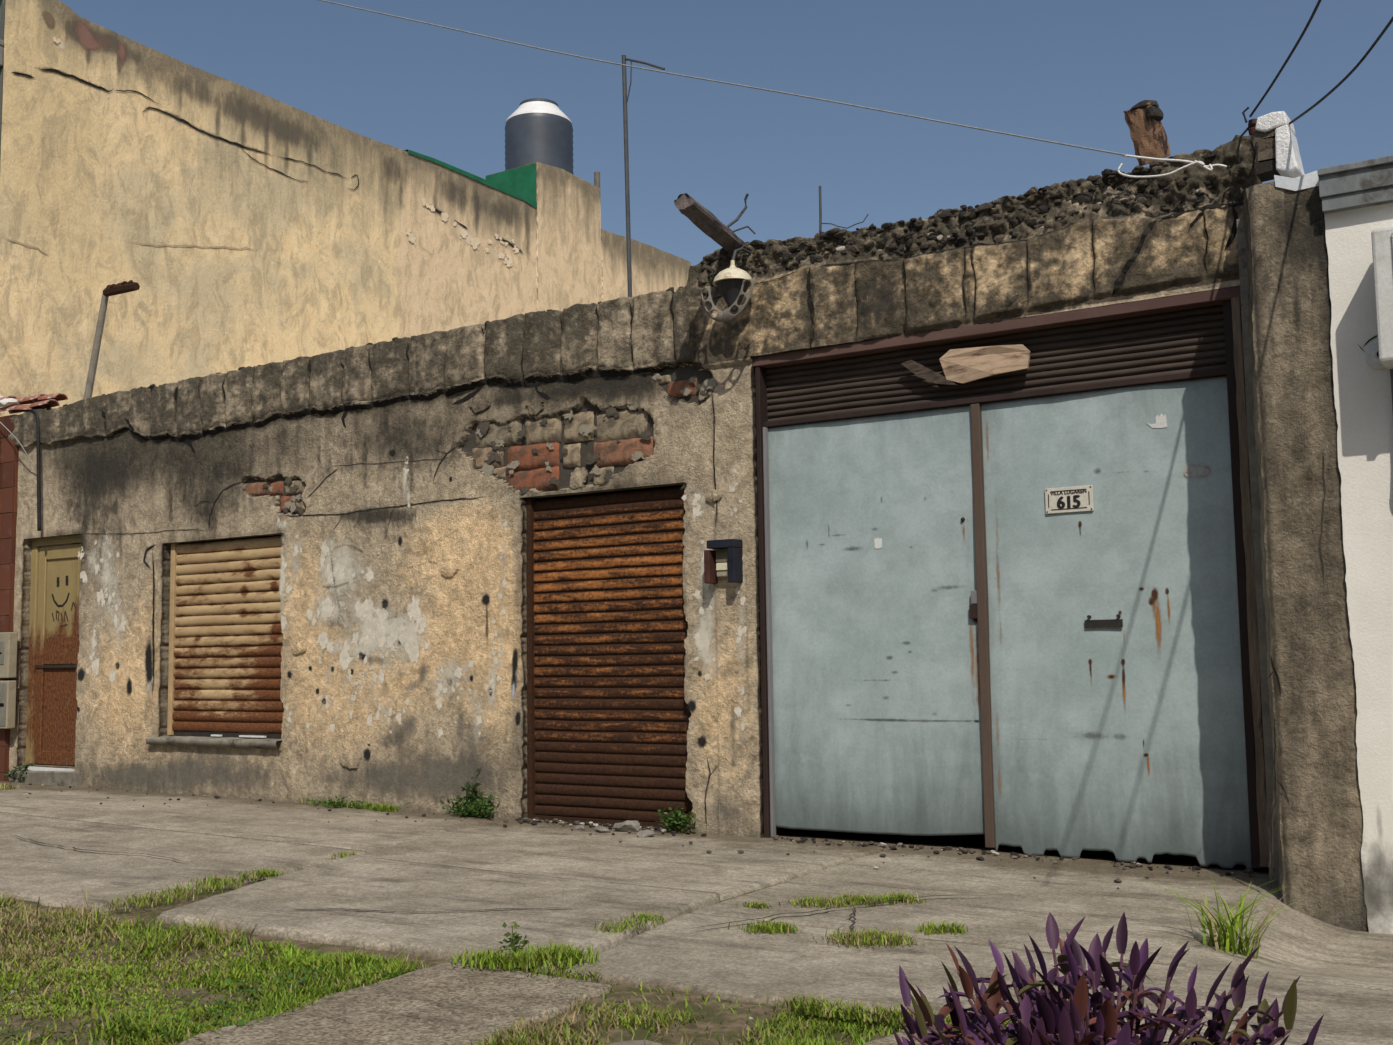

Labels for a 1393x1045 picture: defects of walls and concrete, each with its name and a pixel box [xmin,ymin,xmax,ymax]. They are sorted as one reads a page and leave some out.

crack [12,67,359,190]
water stain [216,101,317,162]
crack [713,202,1244,347]
crack [102,292,697,455]
spalling [651,362,717,406]
crack [279,447,490,538]
spalling [458,401,655,495]
peeling [243,475,429,734]
corrosion [1139,587,1170,644]